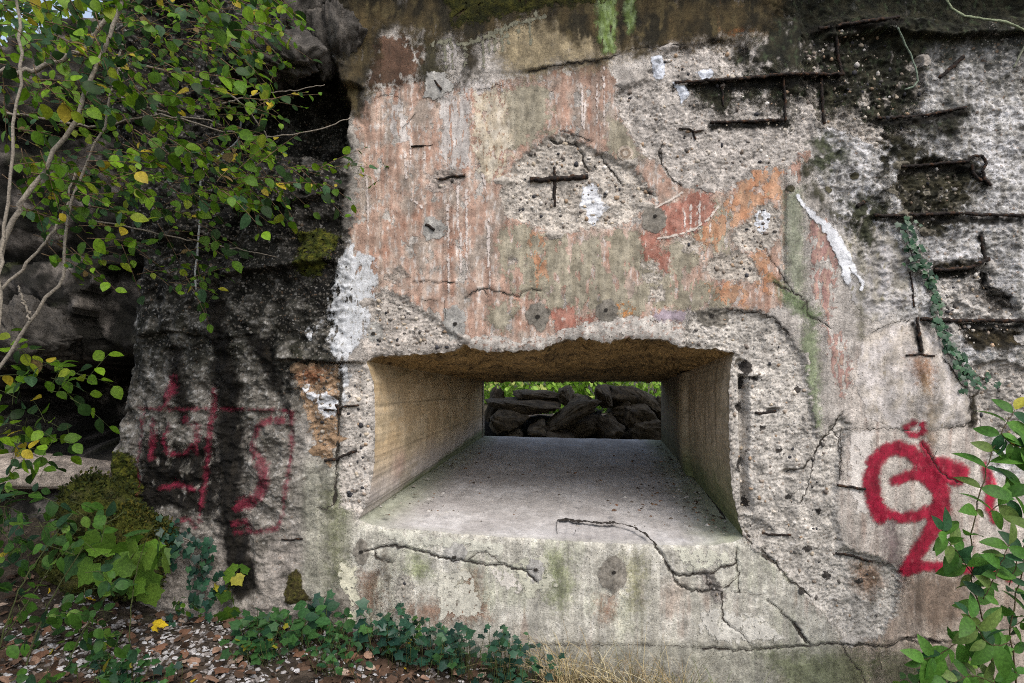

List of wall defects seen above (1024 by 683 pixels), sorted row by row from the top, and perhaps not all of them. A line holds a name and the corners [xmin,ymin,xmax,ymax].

rust [674,35,845,140]
rust [530,167,588,207]
water stain [336,0,1024,353]
spalling [886,156,973,237]
water stain [139,272,256,600]
efflorescence [302,240,379,418]
spalling [290,28,931,648]
crack [786,357,976,504]
rust [906,272,1024,357]
spalling [926,258,1024,441]
crack [364,544,537,582]
crack [543,518,952,681]